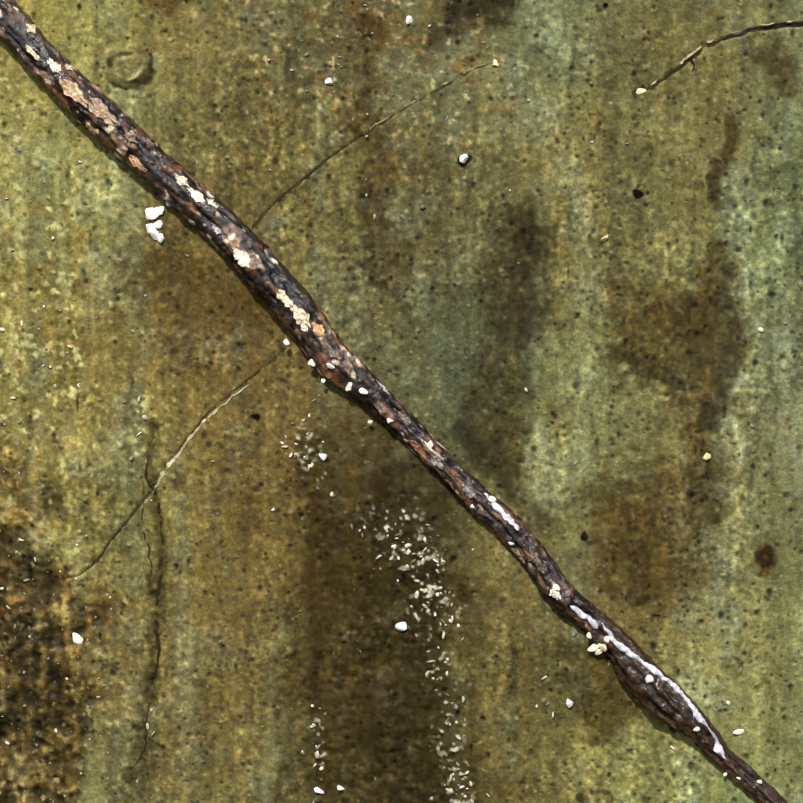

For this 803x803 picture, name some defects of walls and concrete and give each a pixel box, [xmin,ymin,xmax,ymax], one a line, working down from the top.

water stain [425,0,515,50]
crack [646,20,803,90]
rust [749,29,794,96]
rust [706,113,737,201]
water stain [454,210,558,526]
water stain [579,247,747,608]
crack [70,347,288,792]
rust [756,545,777,575]